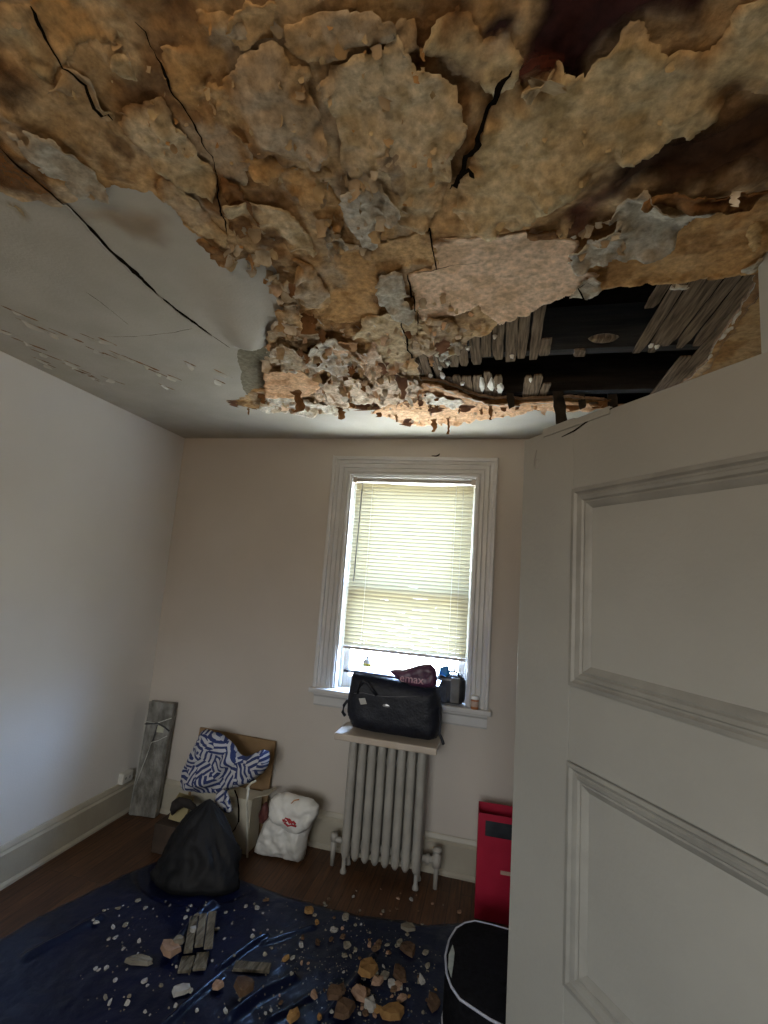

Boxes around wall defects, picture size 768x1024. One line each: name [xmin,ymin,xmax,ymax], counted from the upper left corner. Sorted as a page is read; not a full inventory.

crack [30,6,113,120]
leakage [483,14,516,38]
leakage [518,0,706,80]
leakage [0,140,54,198]
crack [1,149,228,347]
crack [135,22,227,234]
peeling [0,0,768,434]
crack [450,71,512,189]
leakage [568,101,768,228]